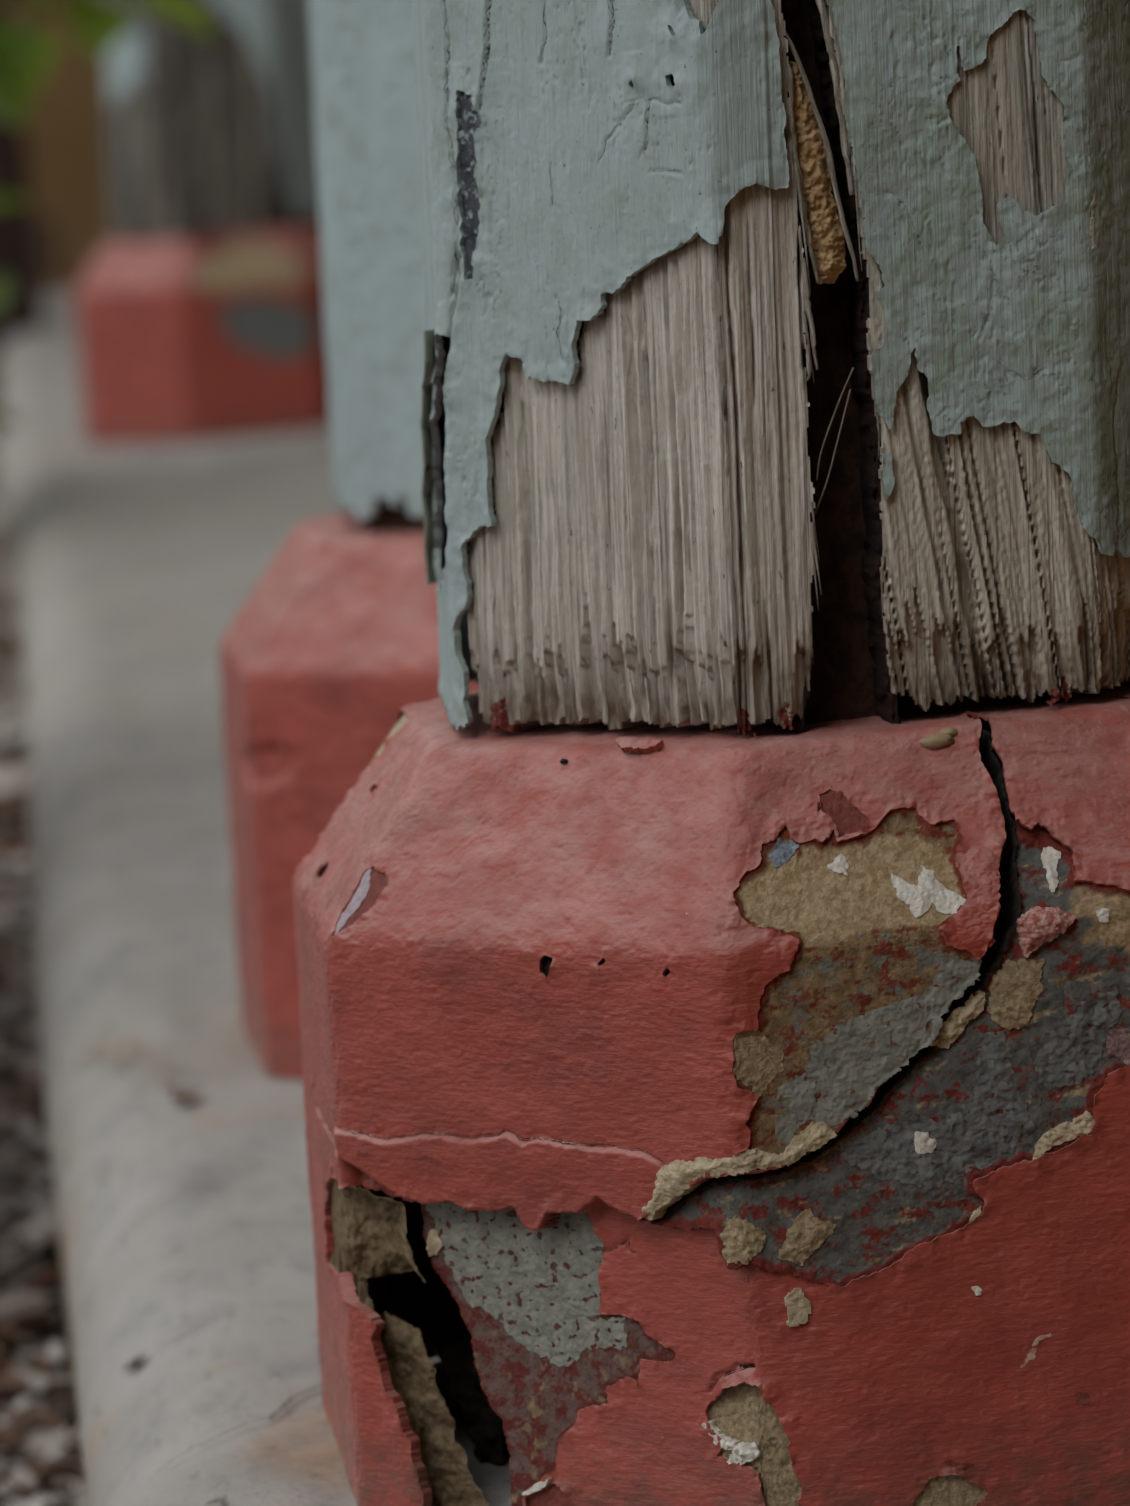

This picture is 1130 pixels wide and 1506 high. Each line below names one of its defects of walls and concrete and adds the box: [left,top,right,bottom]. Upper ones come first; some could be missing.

peeling [421,330,442,585]
peeling [491,363,507,515]
peeling [334,868,388,935]
crack [336,1125,663,1162]
crack [609,729,1023,1253]
spalling [642,786,1130,1327]
peeling [329,1180,676,1506]
peeling [702,1382,802,1506]